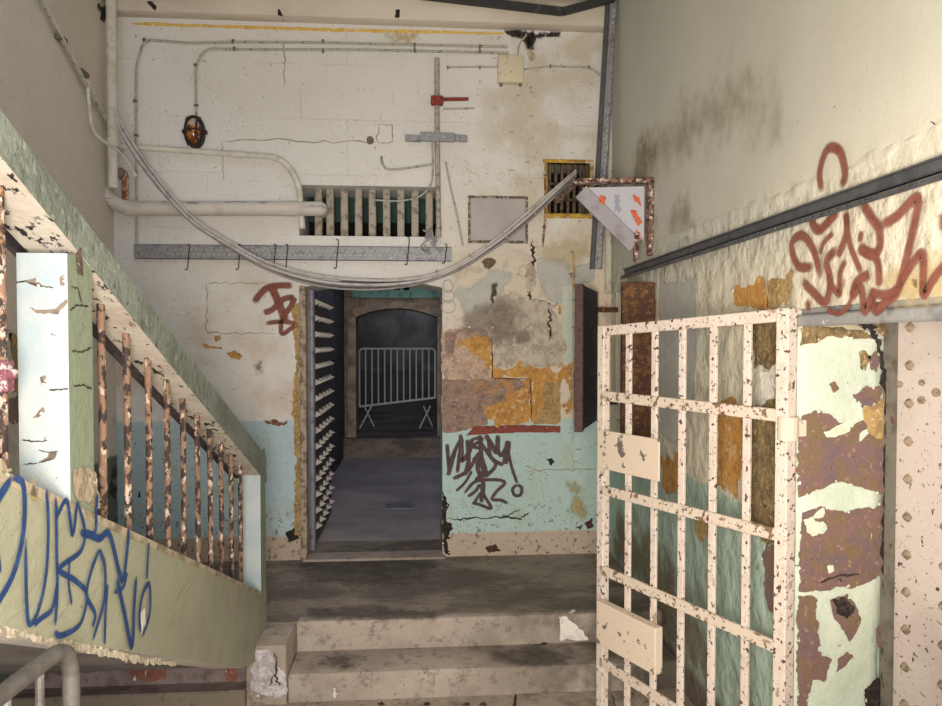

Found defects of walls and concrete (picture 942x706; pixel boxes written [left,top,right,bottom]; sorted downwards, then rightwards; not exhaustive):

peeling [8,333,19,424]
peeling [29,299,68,314]
flaking render [441,263,574,433]
crack [525,239,557,341]
peeling [732,268,793,310]
flaking render [752,322,776,409]
spalling [800,323,888,372]
flaking render [717,396,775,527]
crack [447,510,529,521]
peeling [757,537,774,614]
peeling [795,385,884,706]
spalling [249,649,288,699]